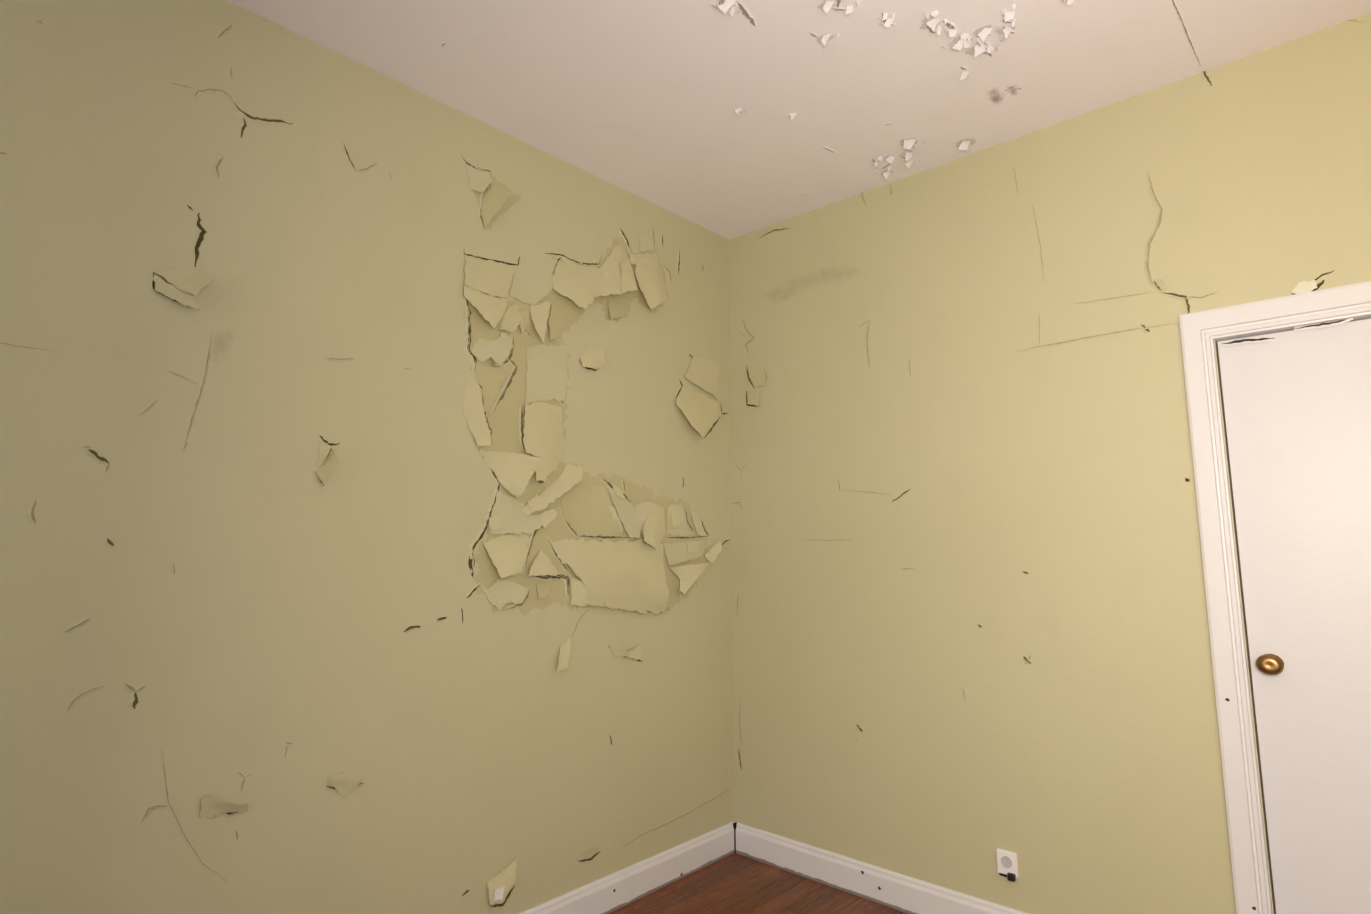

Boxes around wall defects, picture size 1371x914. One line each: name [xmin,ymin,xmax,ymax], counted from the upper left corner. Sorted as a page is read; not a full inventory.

peeling [711,0,758,27]
peeling [817,0,859,15]
peeling [920,4,1017,80]
crack [1170,0,1213,87]
crack [170,23,293,178]
peeling [871,138,928,179]
peeling [149,204,215,312]
crack [1012,165,1219,353]
crack [1222,318,1354,346]
peeling [313,434,340,488]
peeling [403,227,730,673]
peeling [487,856,518,909]